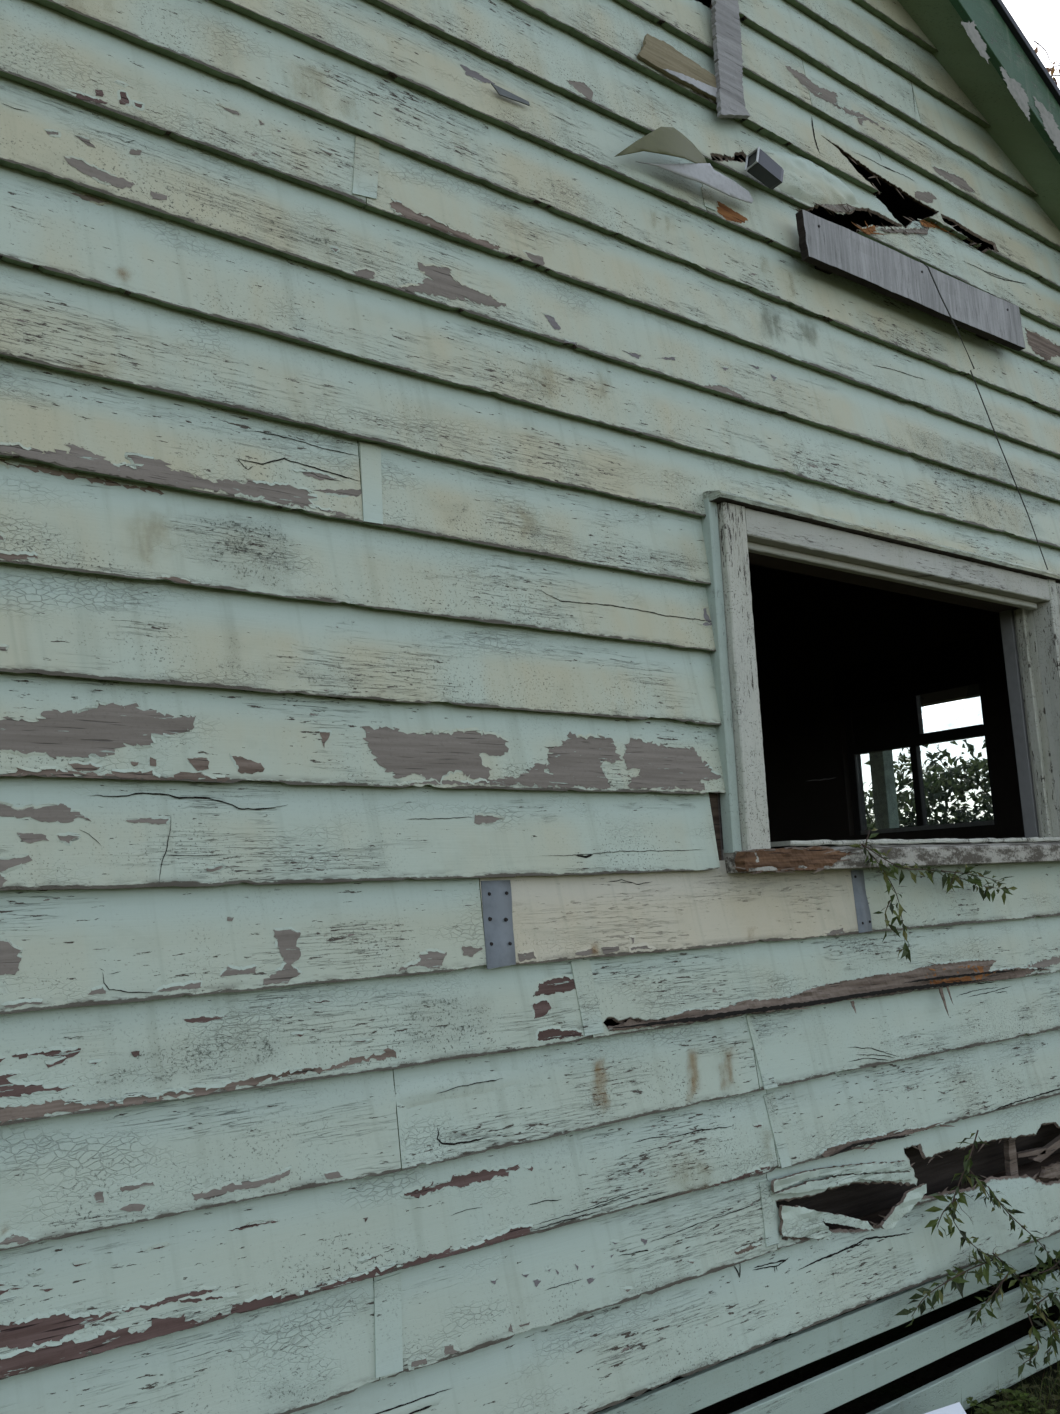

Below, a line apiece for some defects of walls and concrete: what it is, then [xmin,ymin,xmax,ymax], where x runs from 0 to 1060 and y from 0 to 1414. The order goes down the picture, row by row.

peeling [389,197,500,250]
peeling [391,262,507,309]
peeling [0,441,362,520]
peeling [0,700,265,782]
peeling [360,726,724,792]
crack [159,825,216,881]
peeling [0,938,23,975]
peeling [219,927,302,985]
peeling [399,946,483,971]
peeling [532,974,585,1043]
peeling [0,1037,397,1124]
peeling [0,1223,534,1379]